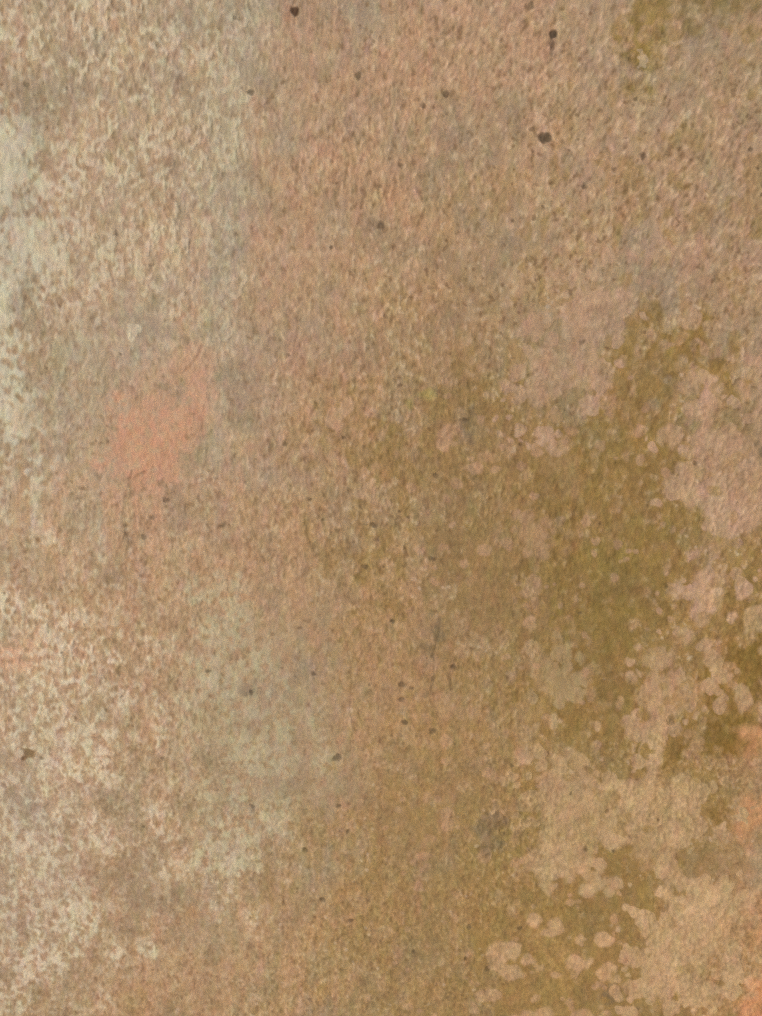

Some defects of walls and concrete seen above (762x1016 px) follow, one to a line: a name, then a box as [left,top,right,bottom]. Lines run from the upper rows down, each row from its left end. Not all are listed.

damp [470,801,510,859]